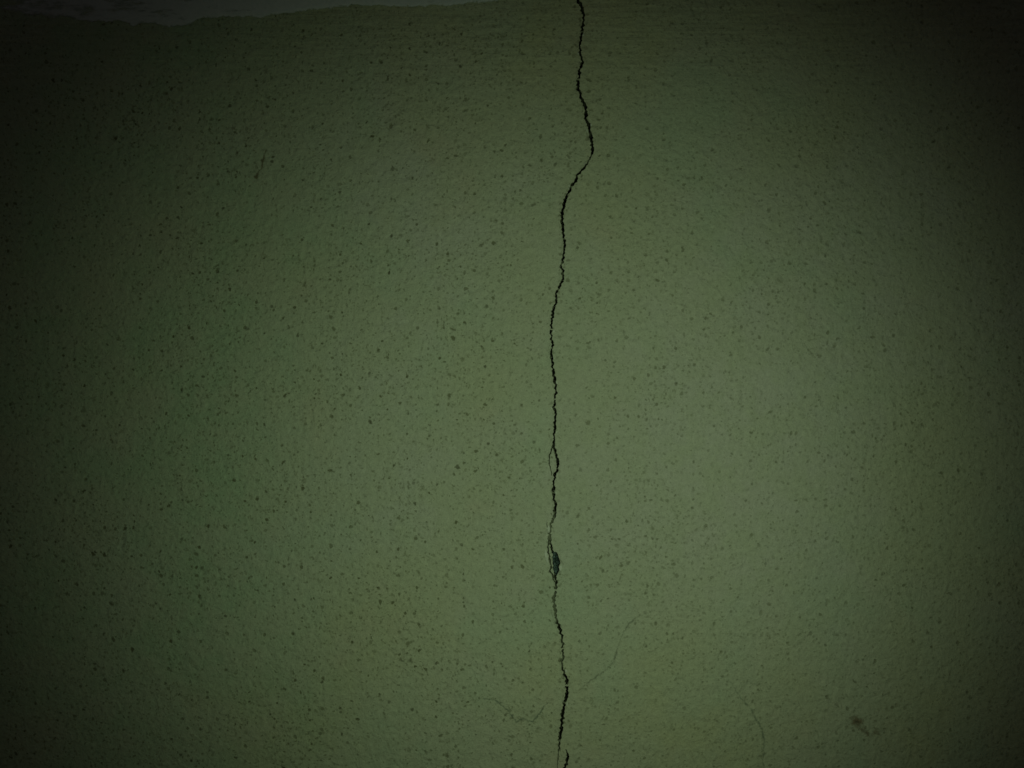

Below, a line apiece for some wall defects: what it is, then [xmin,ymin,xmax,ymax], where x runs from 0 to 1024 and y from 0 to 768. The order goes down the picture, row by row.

crack [545,0,594,768]